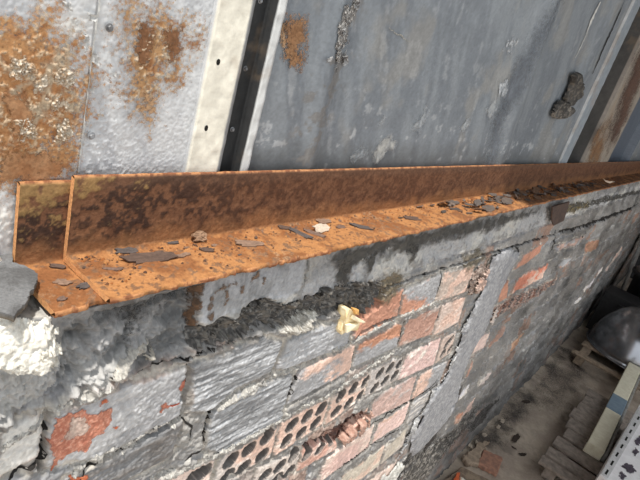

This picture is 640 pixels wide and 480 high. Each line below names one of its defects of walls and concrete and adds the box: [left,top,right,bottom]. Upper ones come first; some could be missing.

rust [0,0,112,197]
rust [111,0,208,141]
rust [280,14,309,73]
peeling [326,0,360,72]
rust [586,43,640,163]
rust [166,230,217,258]
rust [417,180,605,214]
crack [497,203,639,254]
rust [182,282,244,326]
spalling [184,281,386,350]
peeling [46,399,118,471]
spalling [303,411,374,447]